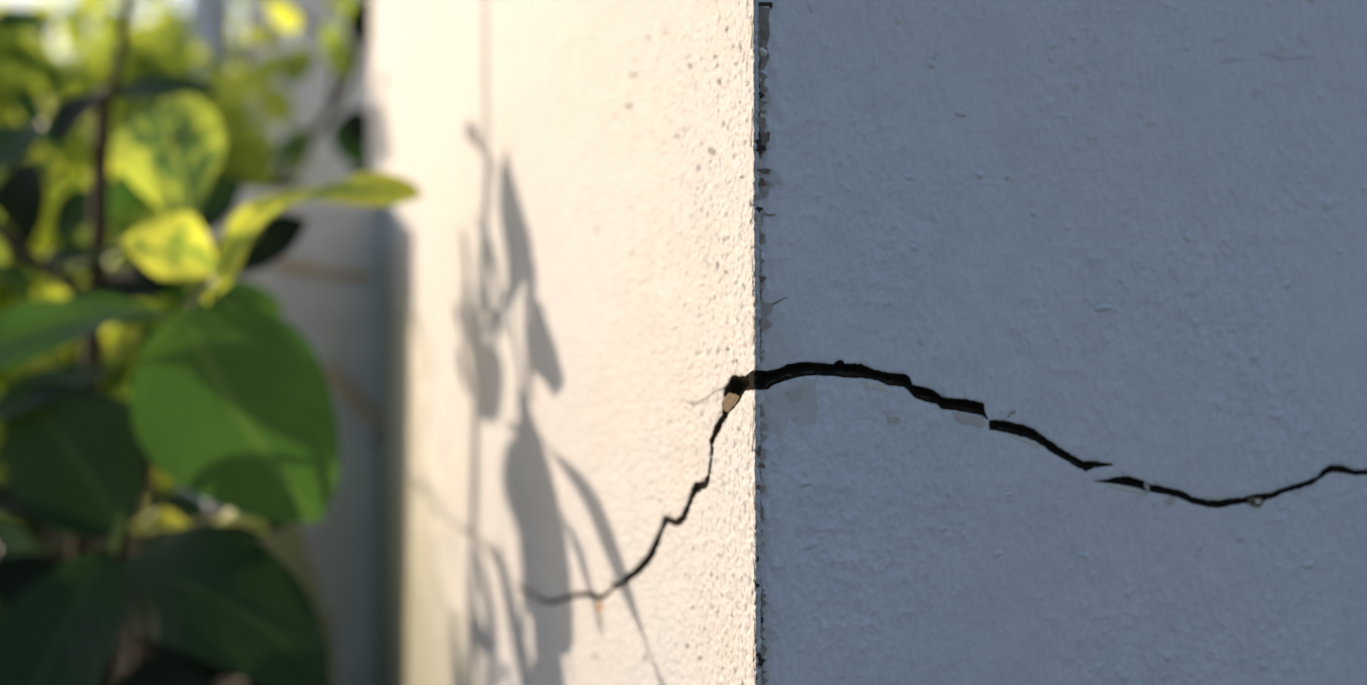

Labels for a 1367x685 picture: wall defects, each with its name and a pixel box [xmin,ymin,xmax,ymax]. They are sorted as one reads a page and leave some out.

crack [515,360,1367,605]